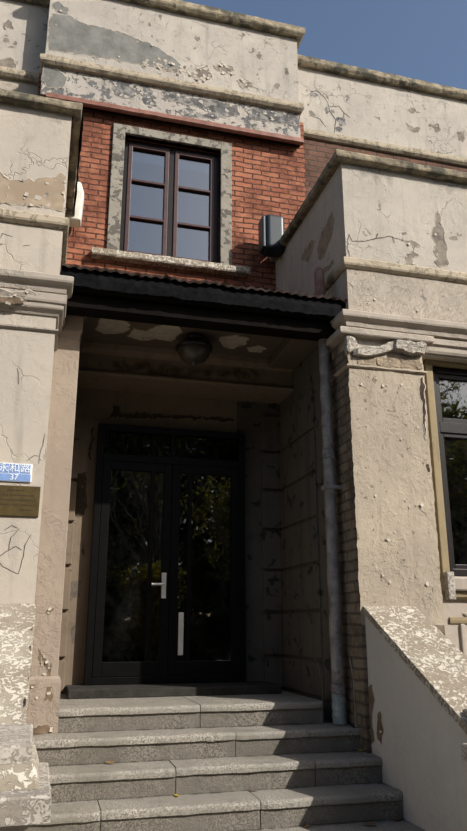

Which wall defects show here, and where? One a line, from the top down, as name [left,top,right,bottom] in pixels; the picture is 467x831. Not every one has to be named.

peeling [47,1,253,90]
peeling [41,65,68,89]
peeling [112,80,300,126]
crack [310,90,350,133]
peeling [0,171,67,212]
crack [346,234,405,257]
peeling [402,232,421,265]
peeling [431,211,450,268]
peeling [95,318,184,342]
peeling [218,334,266,353]
crack [0,525,32,574]
peeling [33,725,53,734]